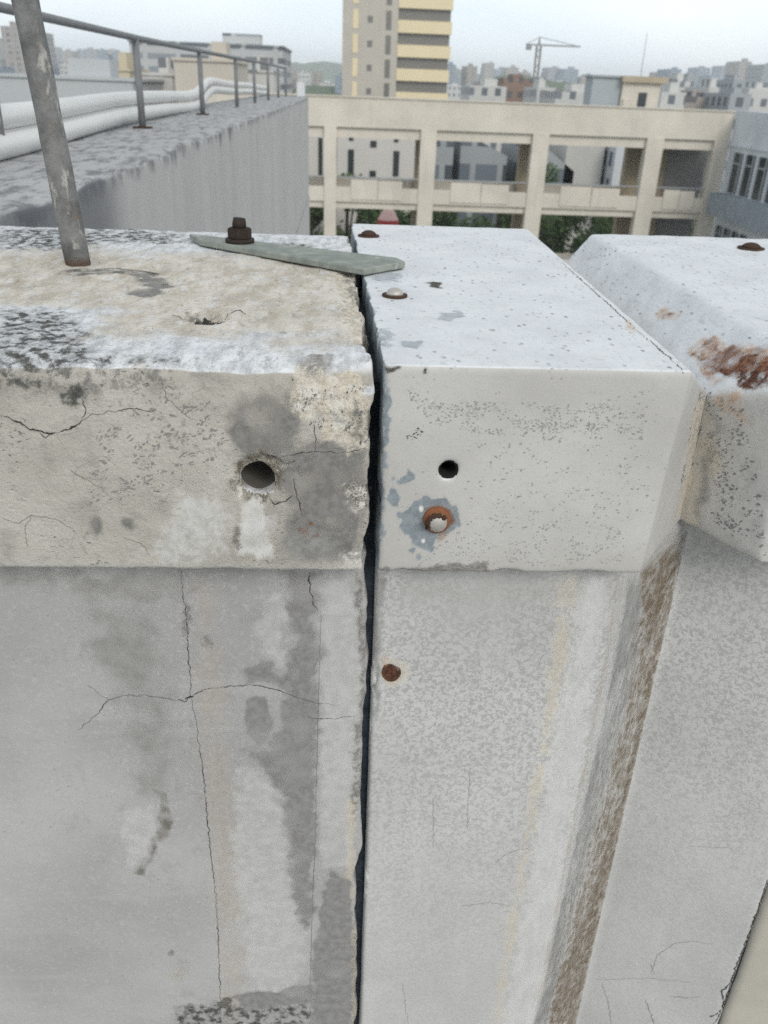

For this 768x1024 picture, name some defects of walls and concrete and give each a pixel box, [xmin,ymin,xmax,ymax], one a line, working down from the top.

crack [4,379,188,438]
rust [425,505,455,530]
spalling [291,354,657,572]
rust [691,337,768,398]
crack [78,571,354,1015]
water stain [227,395,370,1024]